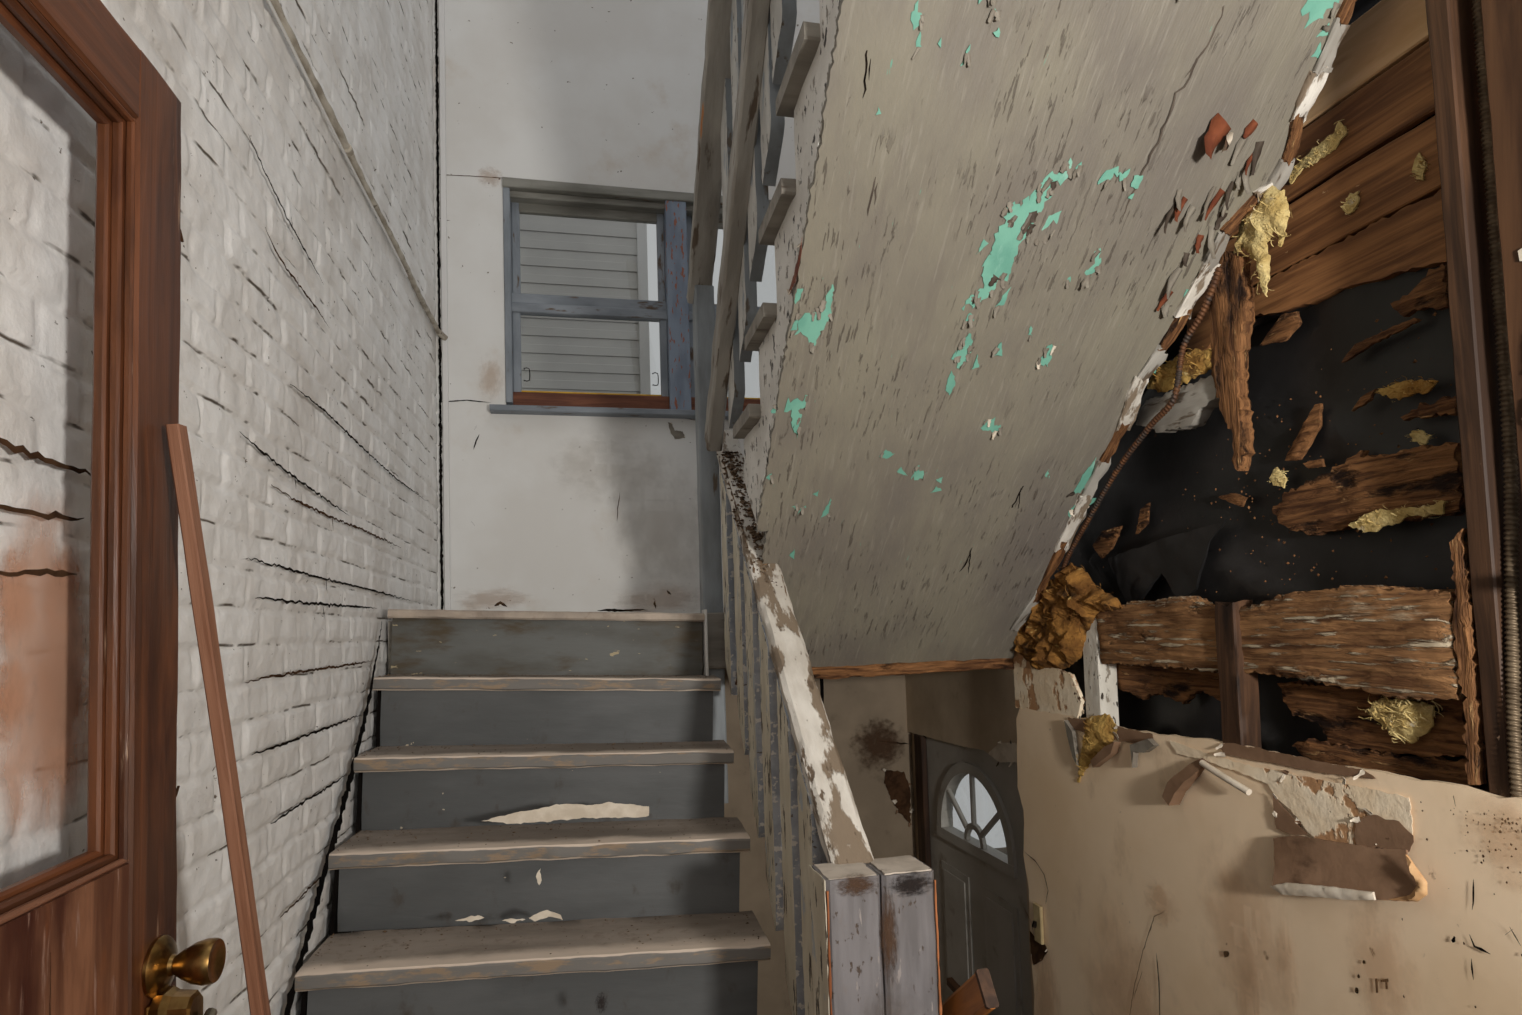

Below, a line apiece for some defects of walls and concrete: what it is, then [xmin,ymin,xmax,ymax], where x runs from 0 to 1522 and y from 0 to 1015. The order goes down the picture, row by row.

peeling [1301,0,1341,58]
peeling [1098,166,1143,199]
peeling [1156,113,1264,318]
peeling [787,240,834,353]
peeling [946,157,1084,395]
crack [0,438,91,476]
crack [0,504,84,521]
crack [0,568,77,577]
damp [4,540,83,813]
peeling [484,802,649,824]
spalling [882,768,914,827]
spalling [1030,931,1048,965]